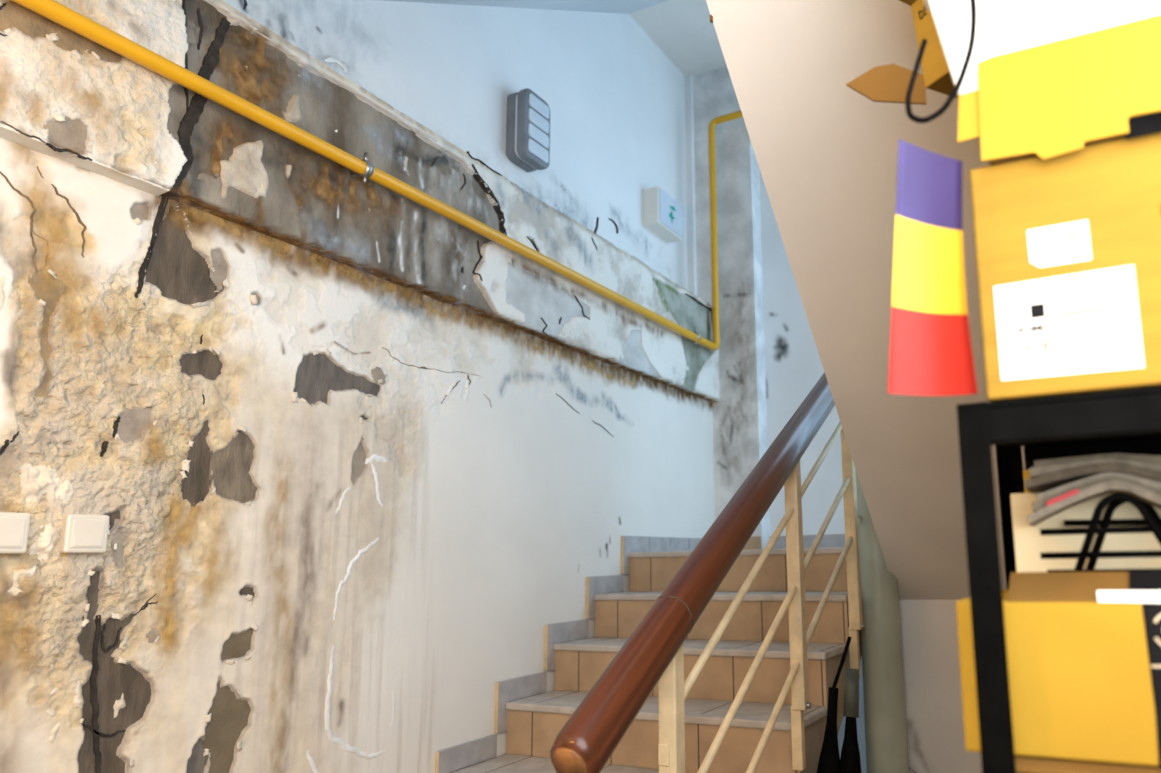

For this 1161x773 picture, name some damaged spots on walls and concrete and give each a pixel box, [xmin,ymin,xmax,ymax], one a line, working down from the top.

crack [0,121,92,274]
crack [134,0,248,298]
spalling [164,0,500,316]
spalling [130,203,230,309]
peeling [506,263,589,337]
water stain [5,338,16,392]
spalling [179,346,223,380]
spalling [291,348,387,404]
spalling [179,420,257,507]
spalling [77,570,151,773]
crack [82,594,158,773]
spalling [187,681,251,773]